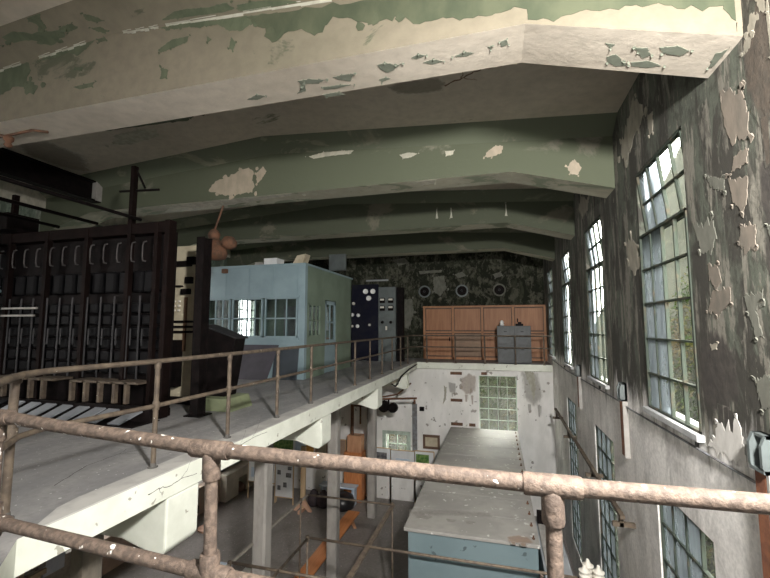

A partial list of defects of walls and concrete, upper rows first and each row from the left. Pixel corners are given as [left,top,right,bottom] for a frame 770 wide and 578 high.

peeling [158,0,737,54]
peeling [740,0,770,57]
damp [386,76,447,95]
peeling [378,50,473,84]
crack [444,66,502,87]
peeling [605,43,694,68]
peeling [162,167,291,214]
peeling [305,150,354,159]
peeling [565,159,582,177]
peeling [704,80,770,255]
damp [740,0,770,336]
damp [698,329,744,433]